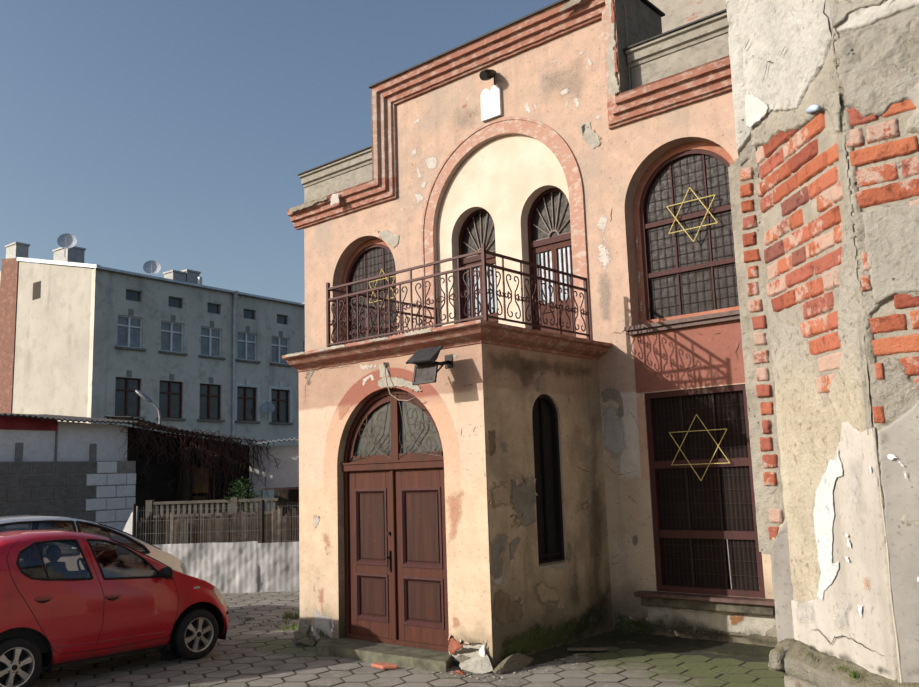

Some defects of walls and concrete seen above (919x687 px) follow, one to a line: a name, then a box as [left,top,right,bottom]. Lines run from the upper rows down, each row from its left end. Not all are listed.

crack [823,3,832,37]
spalling [580,115,601,149]
spalling [745,94,768,128]
peeling [595,215,612,317]
spalling [728,100,919,554]
spalling [359,362,422,393]
spalling [601,386,625,457]
spalling [511,474,538,526]
peeling [813,450,851,600]
spalling [490,533,524,626]
crack [812,629,889,658]